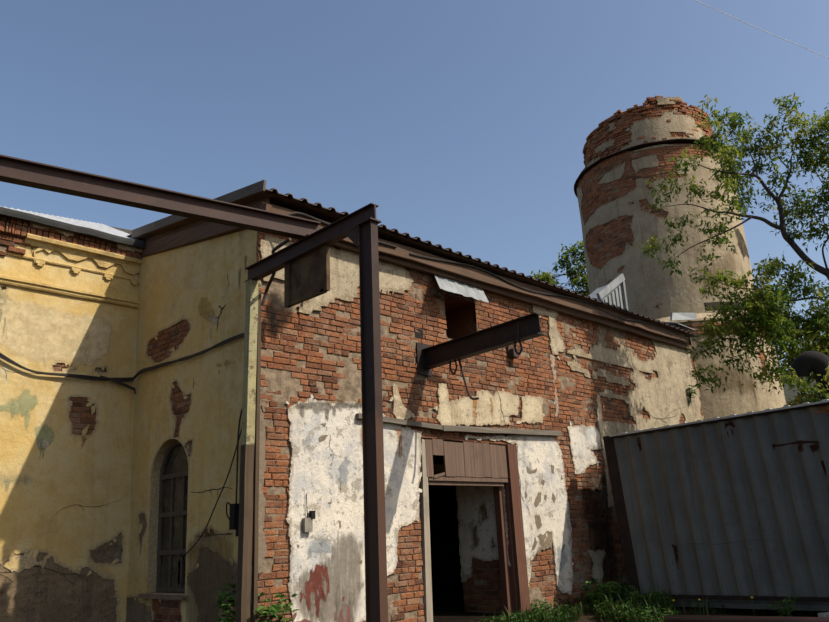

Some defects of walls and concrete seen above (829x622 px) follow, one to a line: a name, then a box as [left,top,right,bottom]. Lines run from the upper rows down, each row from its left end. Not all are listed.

flaking render [577,96,712,269]
flaking render [147,319,190,363]
leakage [262,292,291,343]
leakage [0,391,53,456]
flaking render [69,397,96,435]
flaking render [171,382,191,438]
flaking render [285,395,366,622]
flaking render [383,384,422,576]
flaking render [433,304,704,595]
rust [772,440,821,452]
peeling [0,532,182,622]
peeling [188,526,237,622]